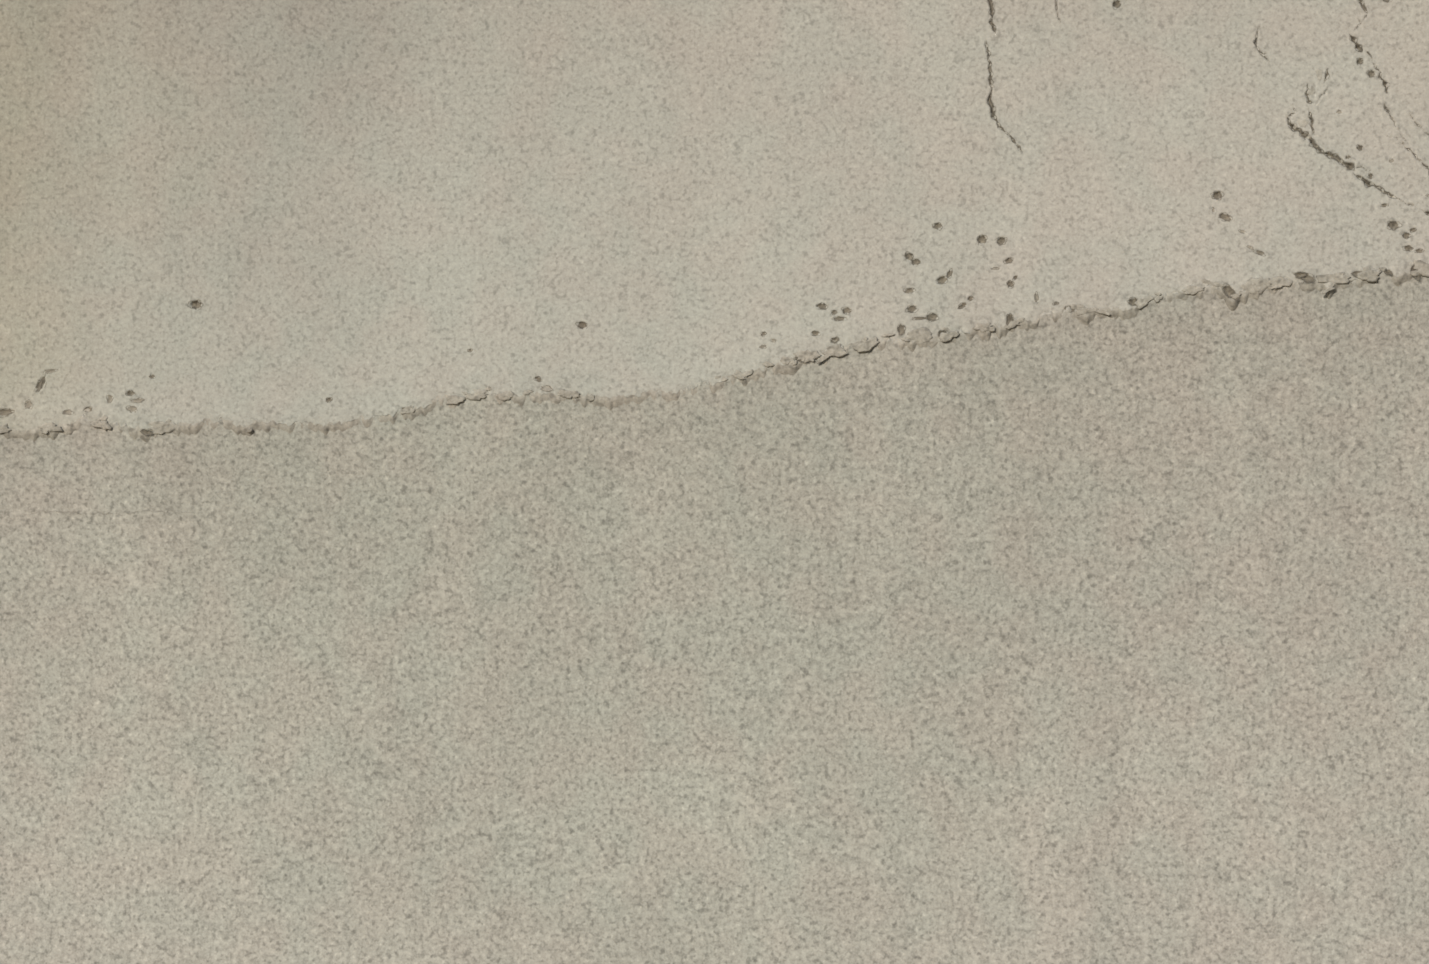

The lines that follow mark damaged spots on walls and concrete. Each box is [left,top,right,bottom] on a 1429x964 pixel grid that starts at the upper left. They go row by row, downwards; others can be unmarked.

crack [985,0,1022,151]
crack [1287,0,1429,215]
spalling [0,204,1429,442]